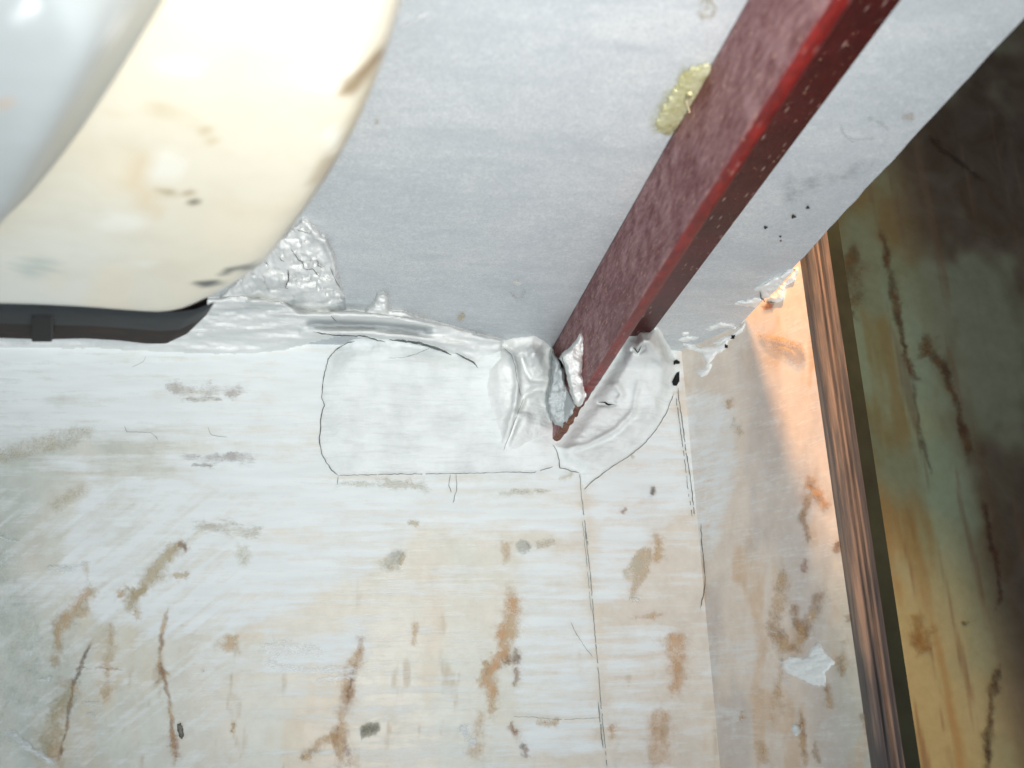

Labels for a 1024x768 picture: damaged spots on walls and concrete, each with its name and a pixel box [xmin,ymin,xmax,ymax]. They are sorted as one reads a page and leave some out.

crack [264,230,340,289]
peeling [678,267,804,377]
crack [316,316,706,765]
rust [118,543,186,608]
rust [344,649,361,698]
rust [482,598,519,700]
peeling [777,642,835,687]